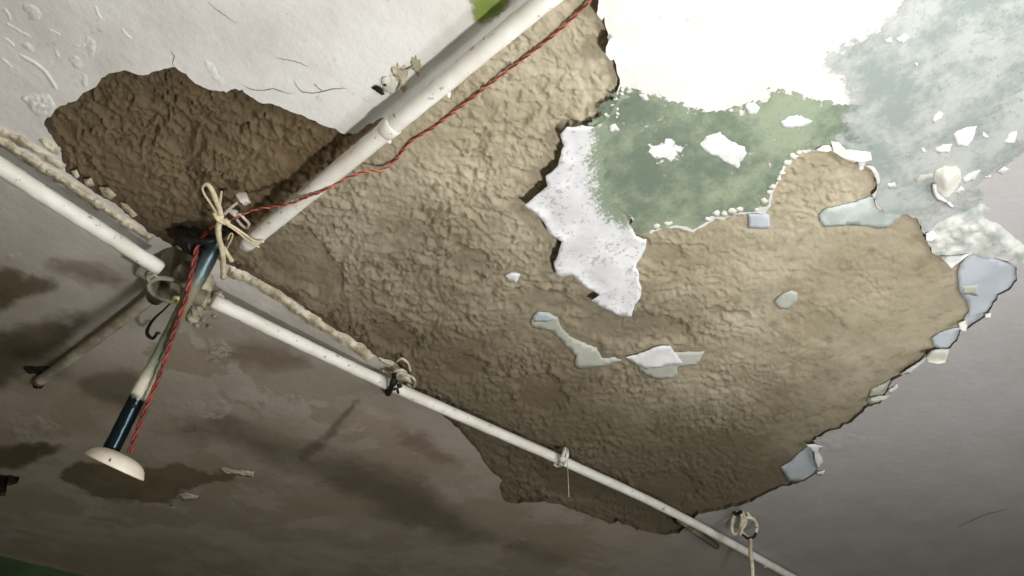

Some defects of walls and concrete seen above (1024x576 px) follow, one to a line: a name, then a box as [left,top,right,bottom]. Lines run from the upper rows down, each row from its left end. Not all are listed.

flaking render [39,67,384,242]
flaking render [219,0,978,532]
leakage [588,0,1024,234]
leakage [60,462,234,503]